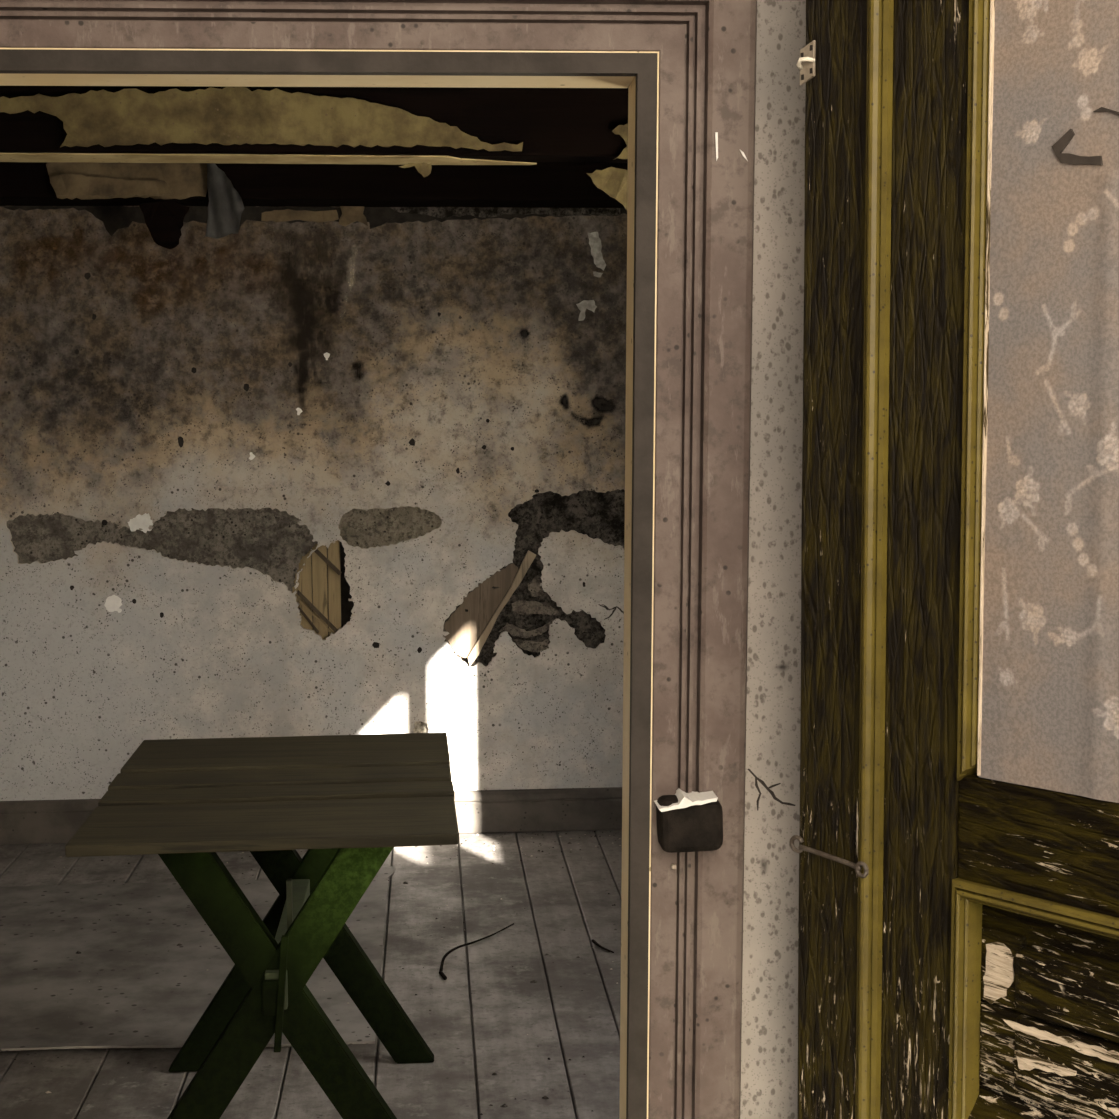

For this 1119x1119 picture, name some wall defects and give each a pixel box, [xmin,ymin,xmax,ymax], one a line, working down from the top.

water stain [18,340,160,432]
water stain [275,228,354,408]
water stain [352,362,363,380]
water stain [491,233,627,428]
flaking render [6,506,442,639]
flaking render [442,488,625,666]
peeling [983,942,1014,1004]
peeling [1015,1050,1077,1076]
peeling [1004,1019,1119,1064]